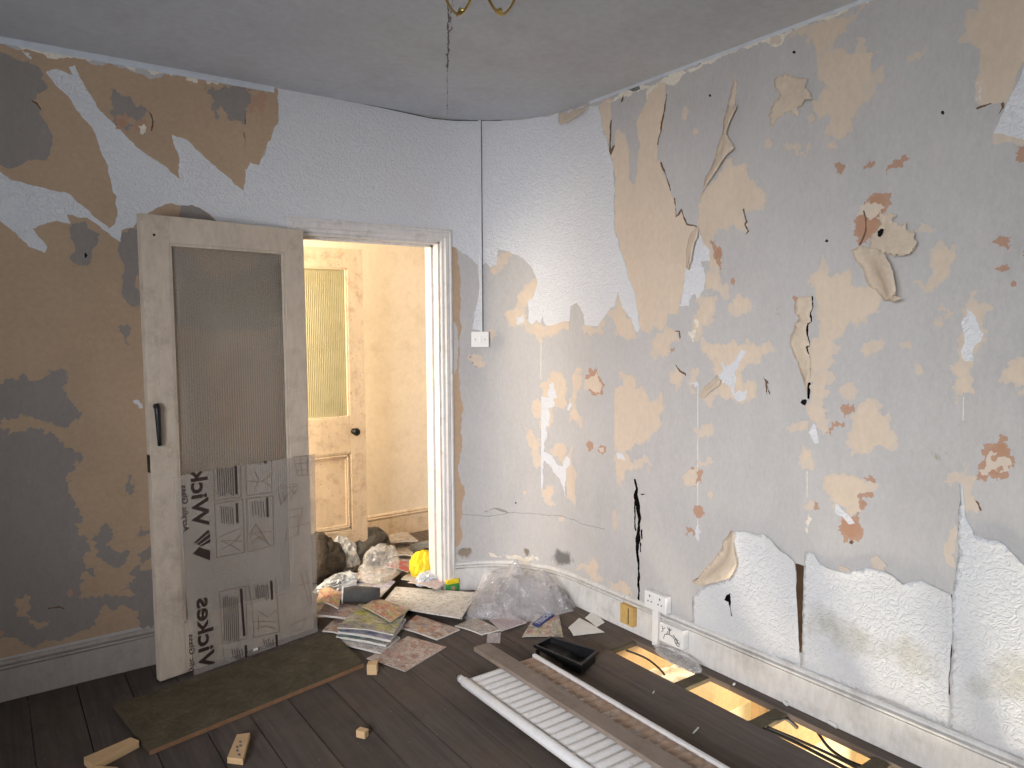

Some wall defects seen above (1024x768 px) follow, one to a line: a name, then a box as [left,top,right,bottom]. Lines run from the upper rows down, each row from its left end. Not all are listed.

peeling [0,47,99,169]
peeling [110,89,154,134]
peeling [186,77,257,139]
peeling [117,228,140,307]
peeling [179,205,216,221]
peeling [850,193,917,302]
flaking render [976,434,1016,481]
peeling [0,368,154,657]
crack [462,508,605,530]
crack [634,479,644,600]
peeling [692,530,737,586]
flaking render [838,472,876,544]